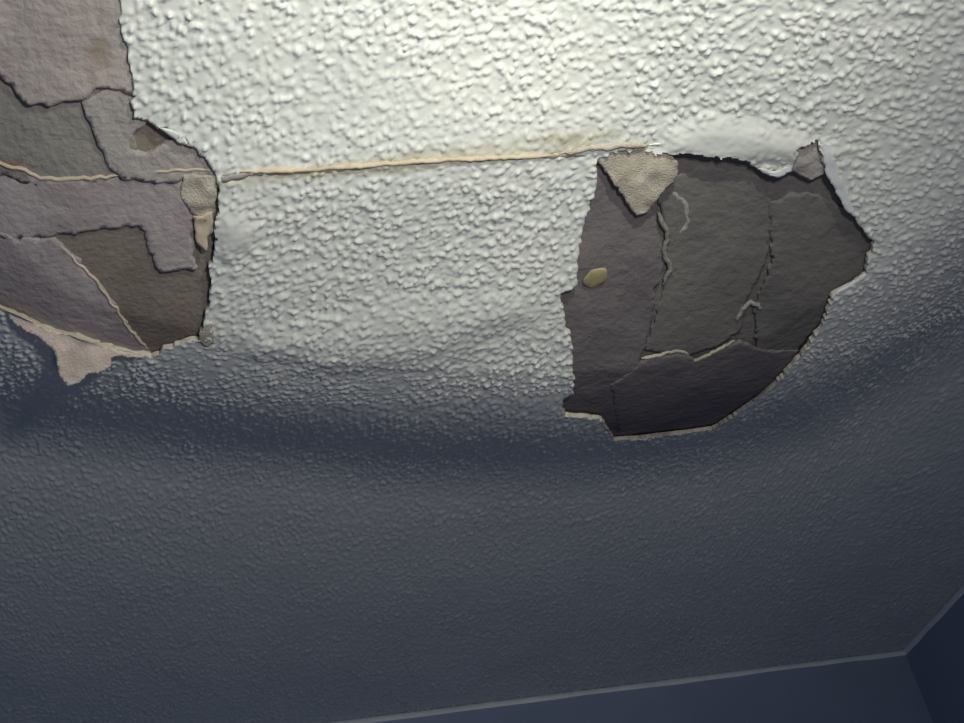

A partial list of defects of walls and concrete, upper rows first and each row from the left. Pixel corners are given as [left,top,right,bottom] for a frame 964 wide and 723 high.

peeling [0,0,219,387]
crack [220,141,666,183]
peeling [560,138,872,439]